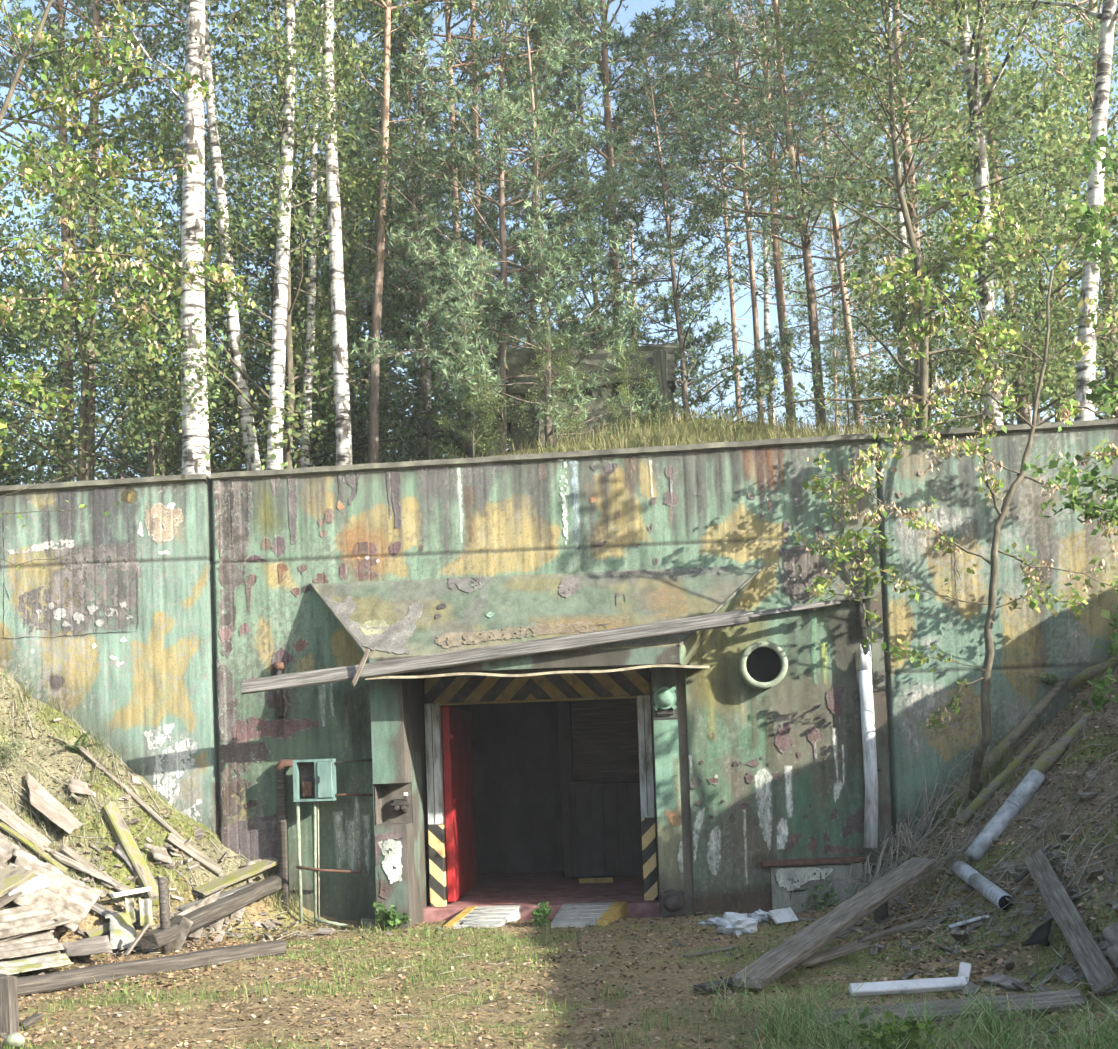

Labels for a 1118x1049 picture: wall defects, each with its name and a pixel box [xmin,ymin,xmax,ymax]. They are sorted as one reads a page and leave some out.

damp [419,459,578,555]
peeling [7,503,183,649]
peeling [213,469,447,871]
peeling [435,611,597,648]
peeling [559,575,581,598]
spalling [144,723,202,822]
spalling [375,831,404,899]
spalling [776,808,864,892]